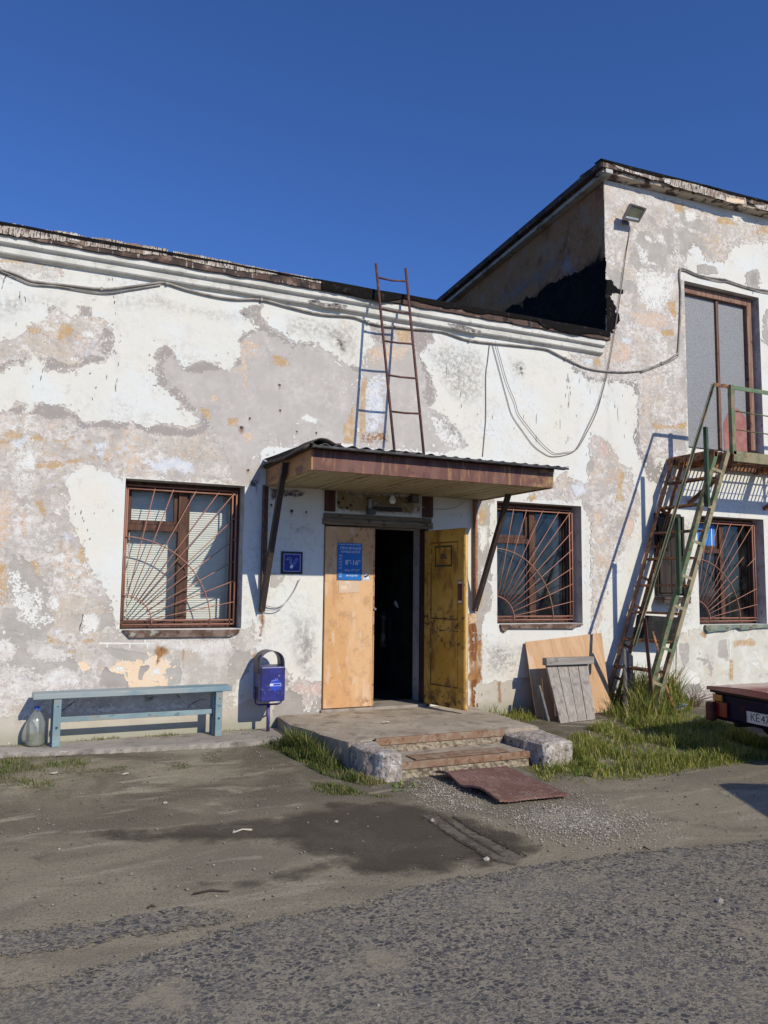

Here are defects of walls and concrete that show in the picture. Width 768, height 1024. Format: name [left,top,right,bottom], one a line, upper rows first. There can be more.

peeling [0,296,469,717]
corrosion [468,612,482,708]
peeling [524,164,768,634]